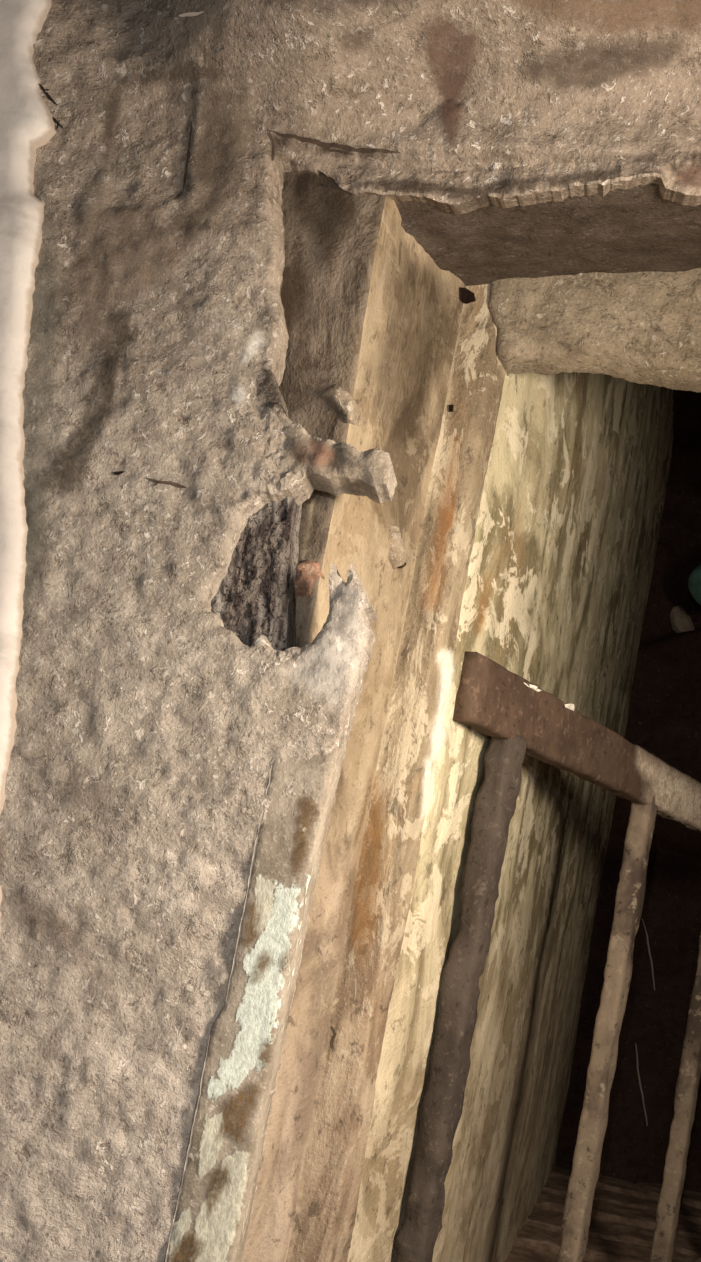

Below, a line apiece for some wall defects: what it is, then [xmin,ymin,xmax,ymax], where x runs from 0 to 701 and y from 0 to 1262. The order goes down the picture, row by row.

damp [427,21,474,139]
damp [530,43,677,86]
crack [175,121,192,198]
damp [27,316,130,500]